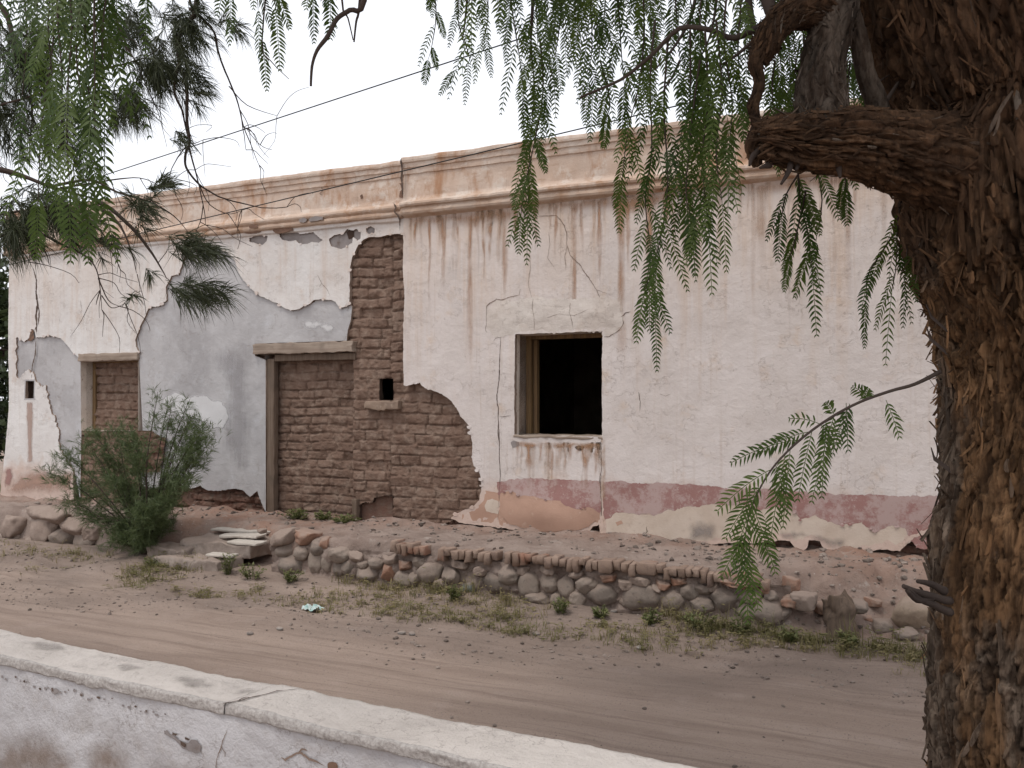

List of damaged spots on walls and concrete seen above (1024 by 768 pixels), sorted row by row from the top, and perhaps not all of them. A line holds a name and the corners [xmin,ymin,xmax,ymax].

peeling [17,329,83,498]
peeling [137,216,565,526]
crack [485,215,604,513]
peeling [542,504,911,548]
spalling [164,730,201,754]